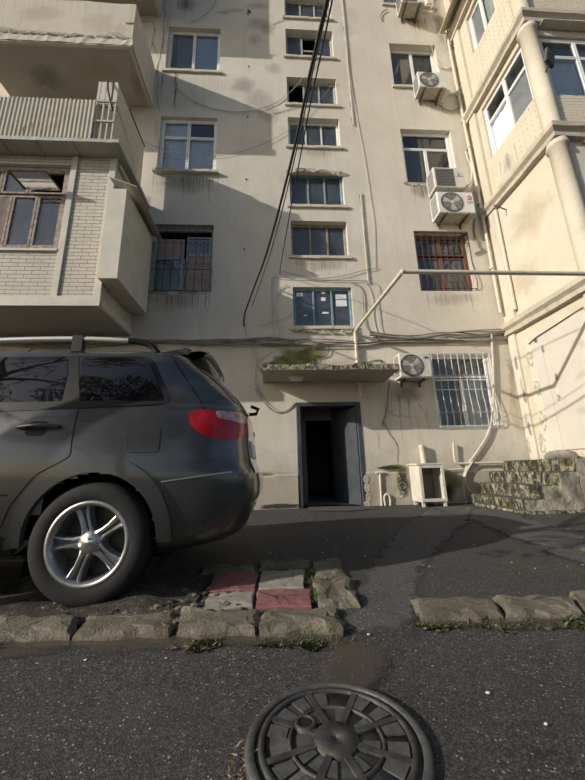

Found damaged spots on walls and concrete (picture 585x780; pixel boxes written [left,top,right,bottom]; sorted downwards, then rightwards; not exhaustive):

flaking render [0,30,131,40]